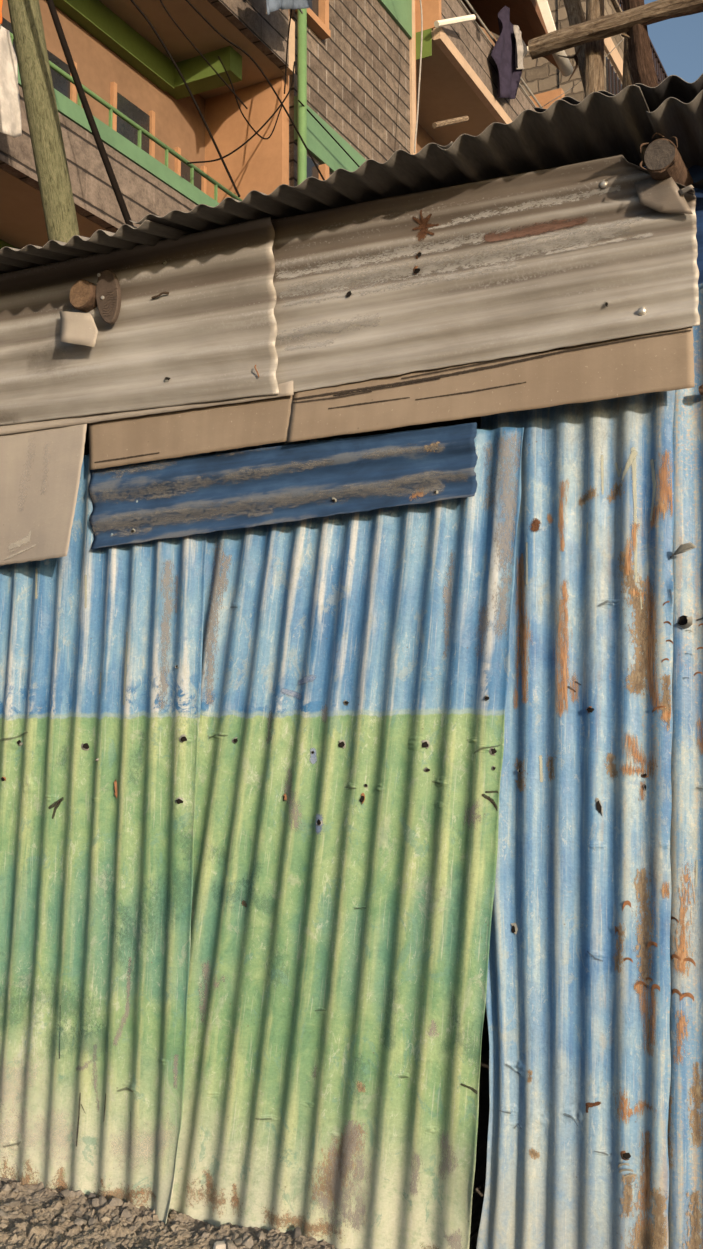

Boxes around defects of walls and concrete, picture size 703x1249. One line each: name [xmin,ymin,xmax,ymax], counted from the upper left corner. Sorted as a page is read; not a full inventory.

rust [483,216,588,242]
rust [553,580,578,718]
rust [530,479,624,551]
rust [618,449,673,730]
rust [613,864,695,1056]
rust [586,1009,703,1249]